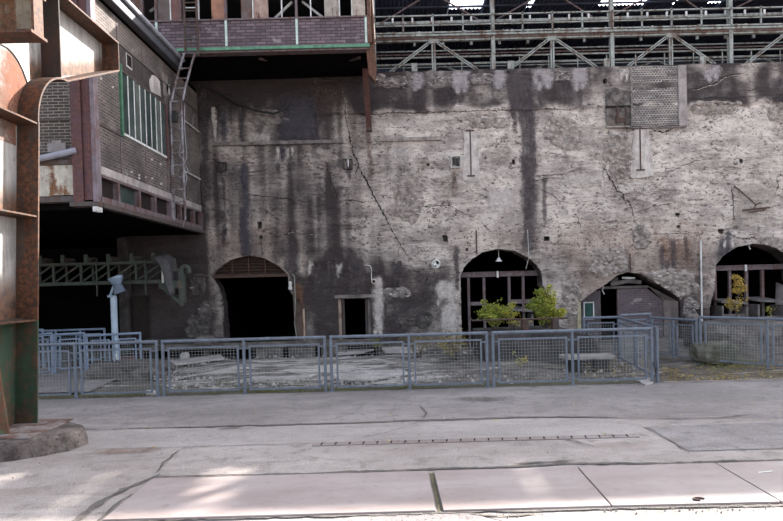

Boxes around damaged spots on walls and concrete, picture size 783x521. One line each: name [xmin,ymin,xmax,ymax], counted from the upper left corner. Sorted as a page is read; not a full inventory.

corrosion [1,51,26,113]
corrosion [2,120,17,146]
leakage [200,90,229,204]
leakage [239,164,251,255]
crack [314,93,514,261]
leakage [507,71,547,254]
crack [534,174,588,228]
crack [600,164,703,223]
crack [723,187,759,242]